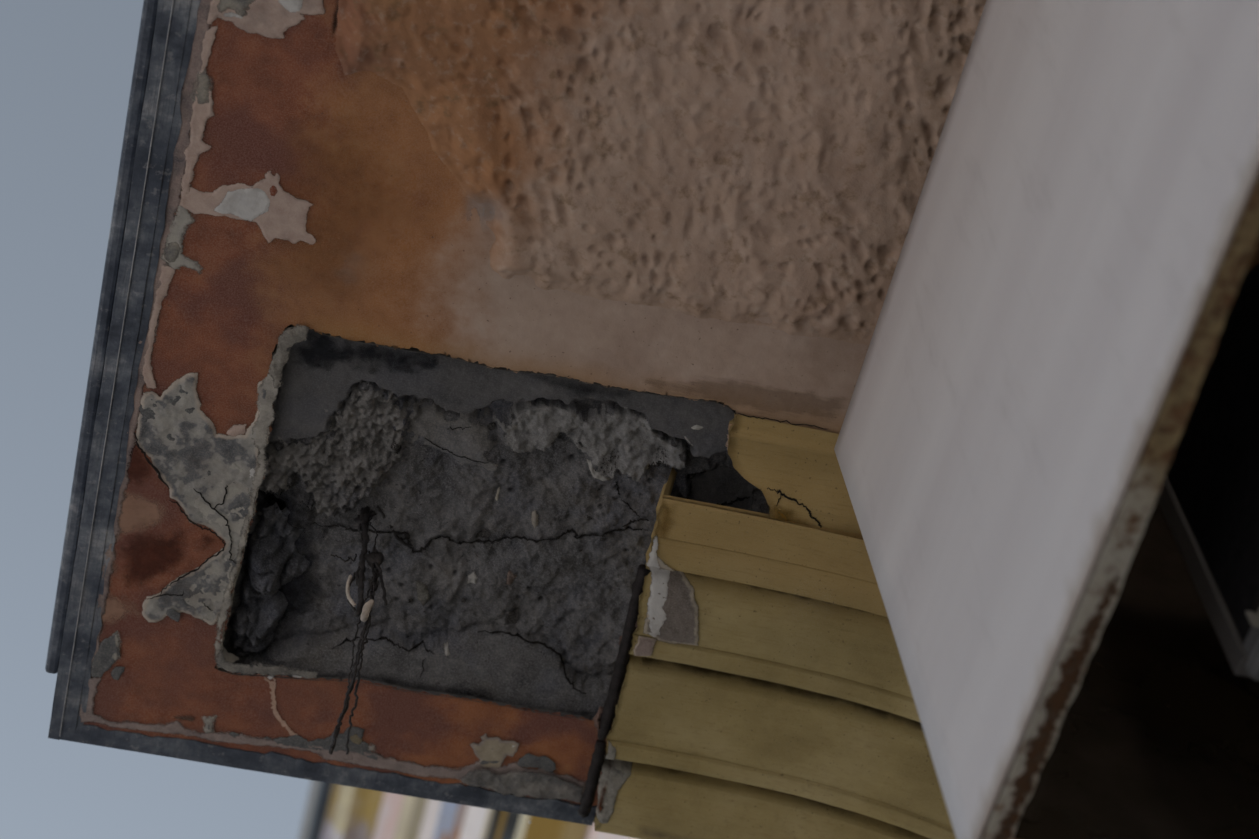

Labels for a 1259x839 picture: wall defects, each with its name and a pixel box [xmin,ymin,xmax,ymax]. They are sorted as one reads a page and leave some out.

spalling [79,0,770,823]
crack [313,481,649,553]
crack [332,636,435,678]
crack [477,630,587,694]
corrosion [993,575,1120,839]